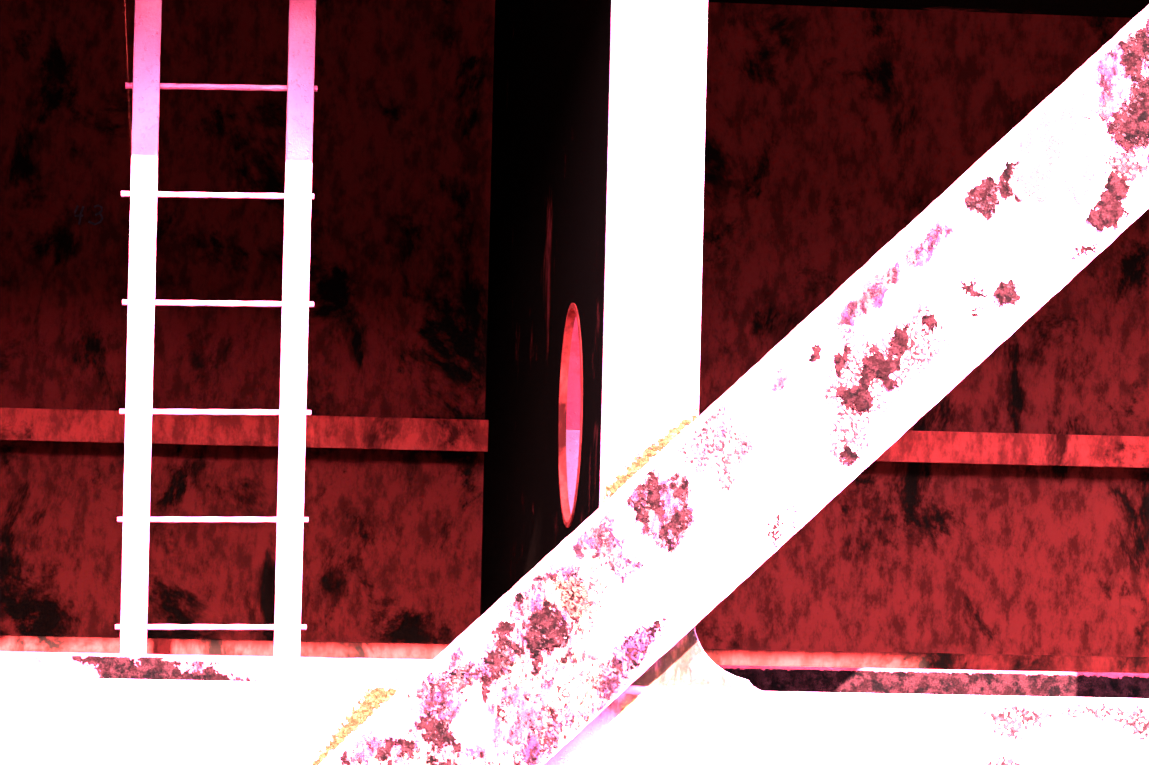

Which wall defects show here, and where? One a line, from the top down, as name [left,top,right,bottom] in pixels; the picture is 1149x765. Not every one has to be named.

rust [1085,15,1149,231]
rust [1070,235,1098,259]
rust [808,158,1025,471]
rust [763,501,808,547]
rust [332,401,764,765]
water stain [609,694,741,765]
rust [974,700,1149,765]